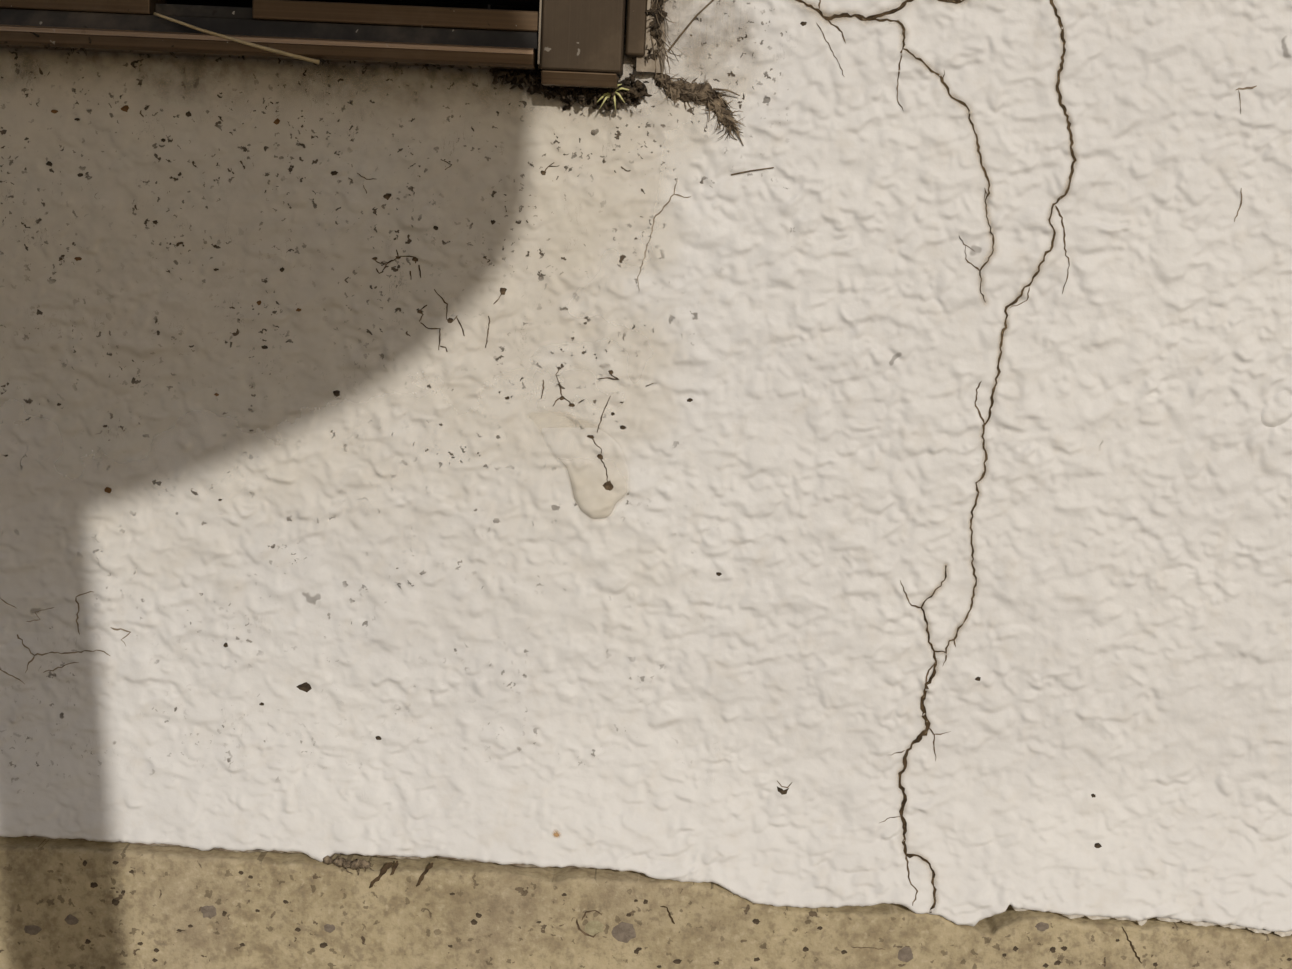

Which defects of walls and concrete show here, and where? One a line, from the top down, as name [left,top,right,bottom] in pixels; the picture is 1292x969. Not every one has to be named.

crack [637,182,691,288]
crack [796,0,1077,913]